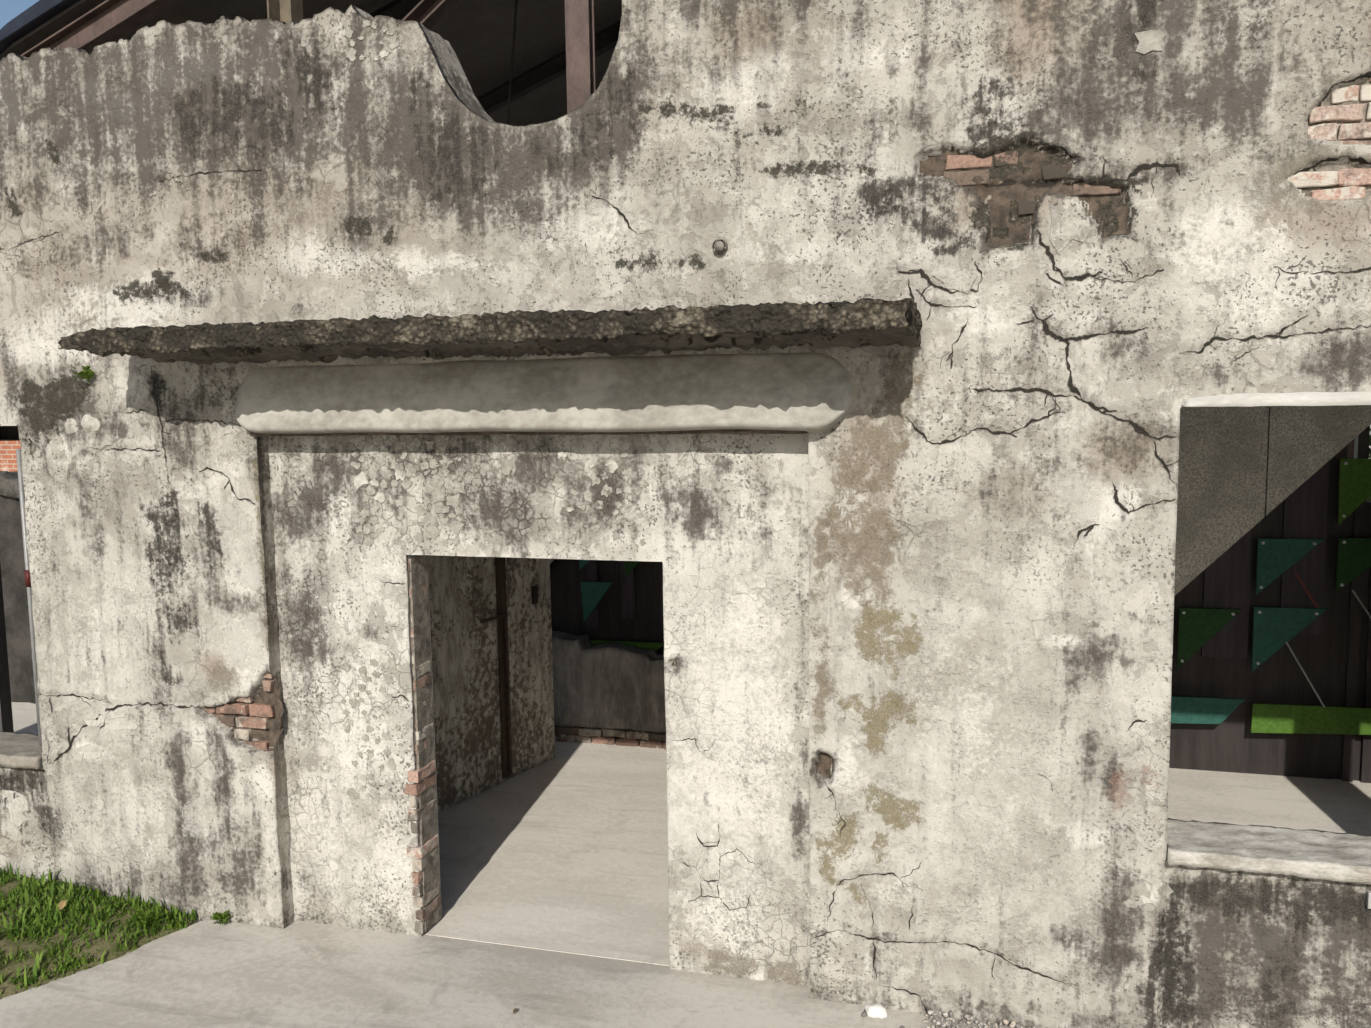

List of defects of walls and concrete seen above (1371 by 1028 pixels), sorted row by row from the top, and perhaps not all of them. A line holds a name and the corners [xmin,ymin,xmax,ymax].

damp [169,33,340,159]
damp [409,73,499,210]
damp [535,68,637,172]
spalling [920,141,1131,254]
spalling [1286,162,1371,201]
spalling [1308,77,1371,145]
crack [898,229,1180,547]
crack [1179,315,1370,363]
crack [40,693,249,764]
spalling [340,436,466,934]
crack [815,863,1077,1014]
damp [1136,873,1371,1028]